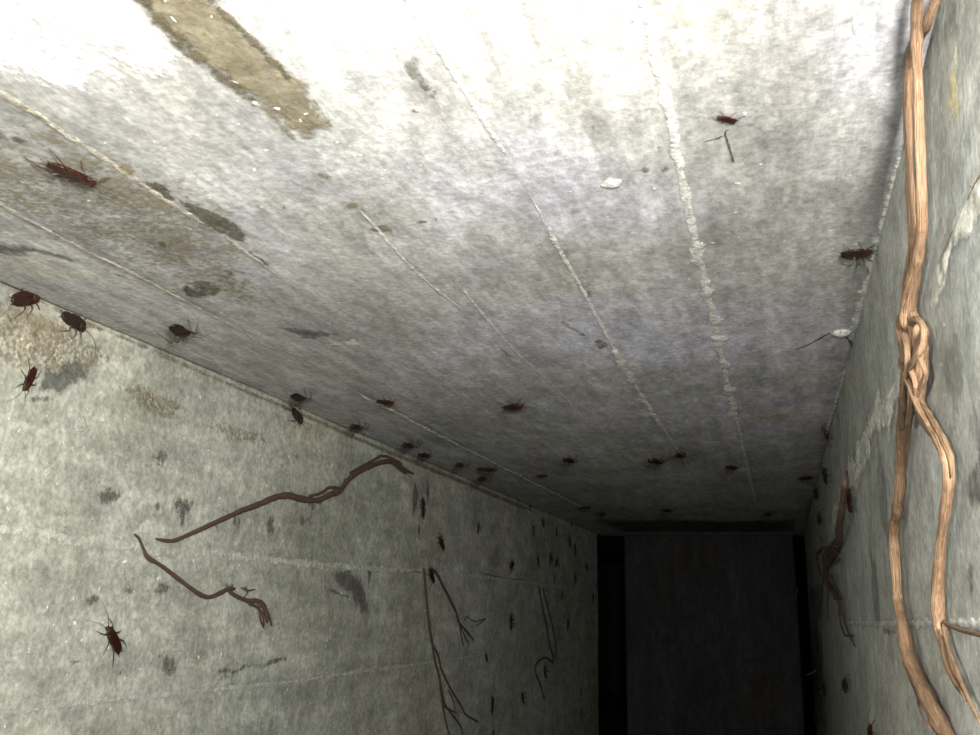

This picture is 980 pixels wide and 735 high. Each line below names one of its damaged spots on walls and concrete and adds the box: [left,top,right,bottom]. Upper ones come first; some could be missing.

leakage [0,0,332,139]
leakage [0,133,254,301]